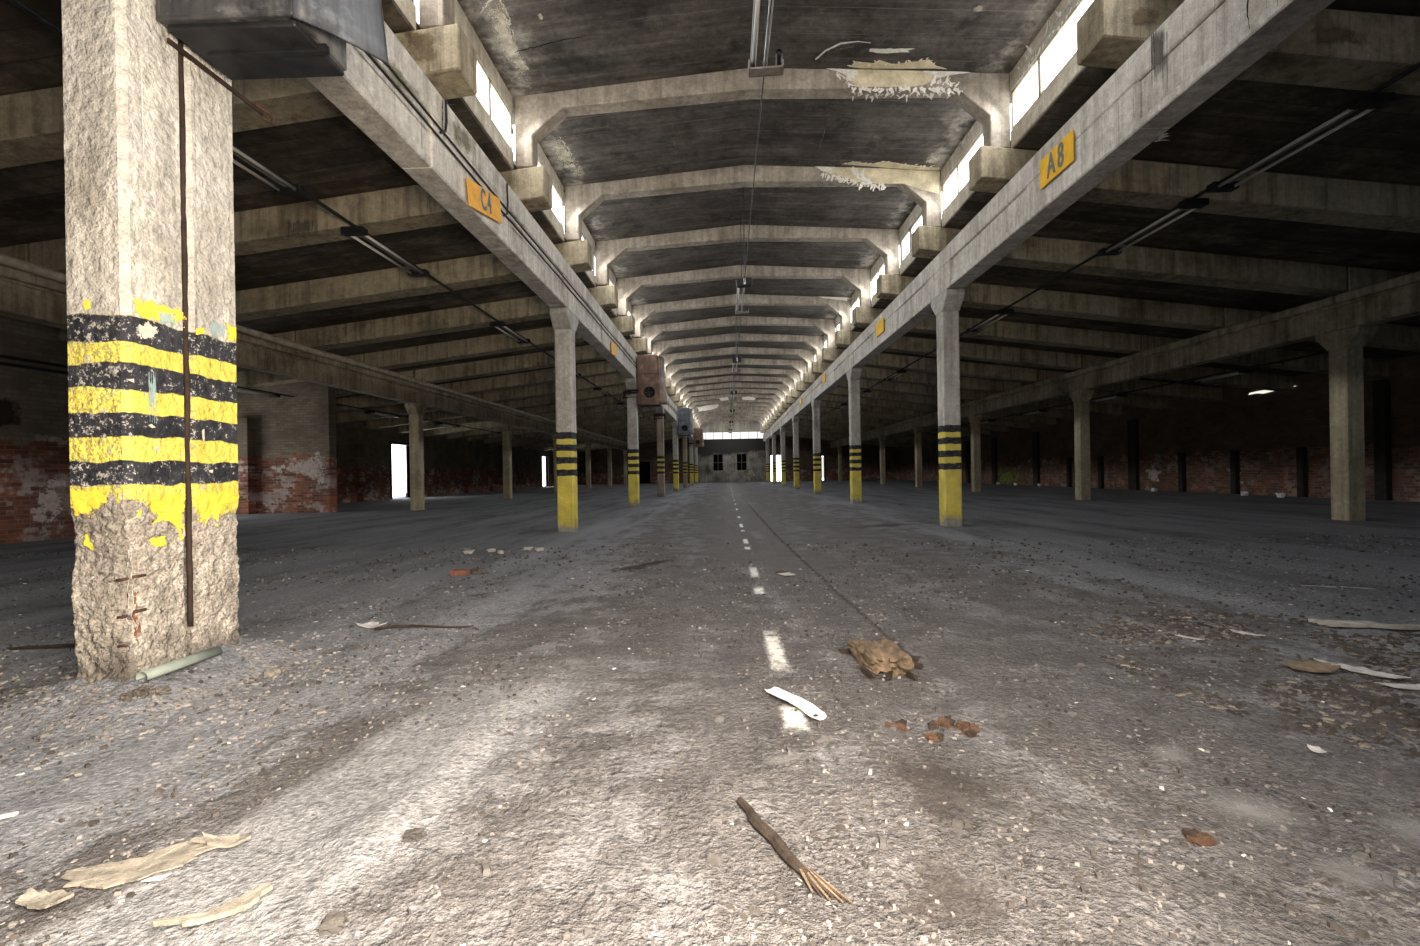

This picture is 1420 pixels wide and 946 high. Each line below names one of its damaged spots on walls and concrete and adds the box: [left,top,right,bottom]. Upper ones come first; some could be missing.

water stain [482,0,528,70]
peeling [815,41,971,102]
peeling [815,161,941,194]
peeling [271,452,327,488]
spalling [30,476,240,684]